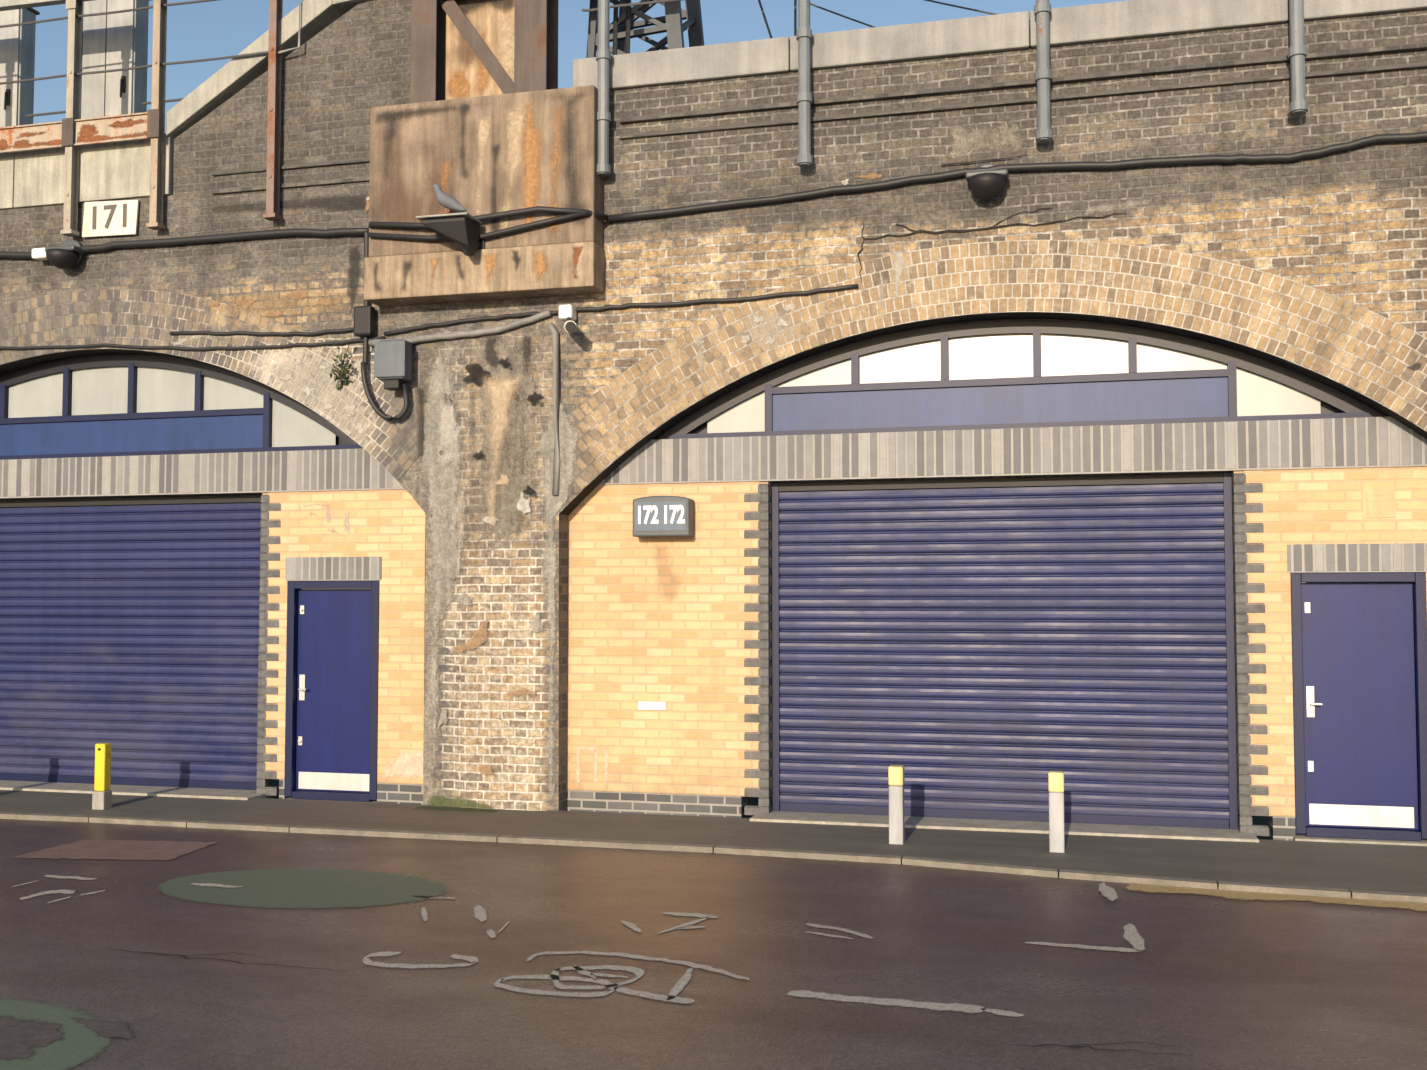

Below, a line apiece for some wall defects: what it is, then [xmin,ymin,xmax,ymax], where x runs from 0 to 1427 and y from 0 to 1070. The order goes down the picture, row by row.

corrosion [0,118,147,150]
corrosion [478,120,490,172]
corrosion [504,108,560,225]
corrosion [573,246,582,278]
damp [485,335,529,459]
damp [440,401,471,462]